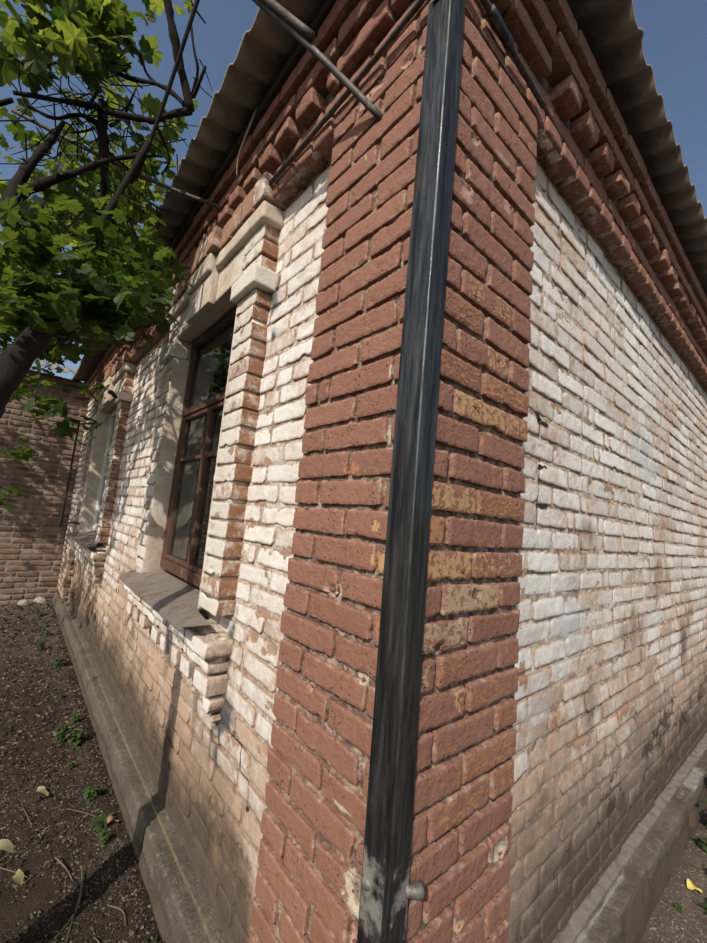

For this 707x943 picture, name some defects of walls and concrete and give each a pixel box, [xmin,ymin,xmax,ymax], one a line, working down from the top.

peeling [441,346,529,445]
damp [57,588,250,943]
spalling [341,867,361,943]
peeling [416,481,528,835]